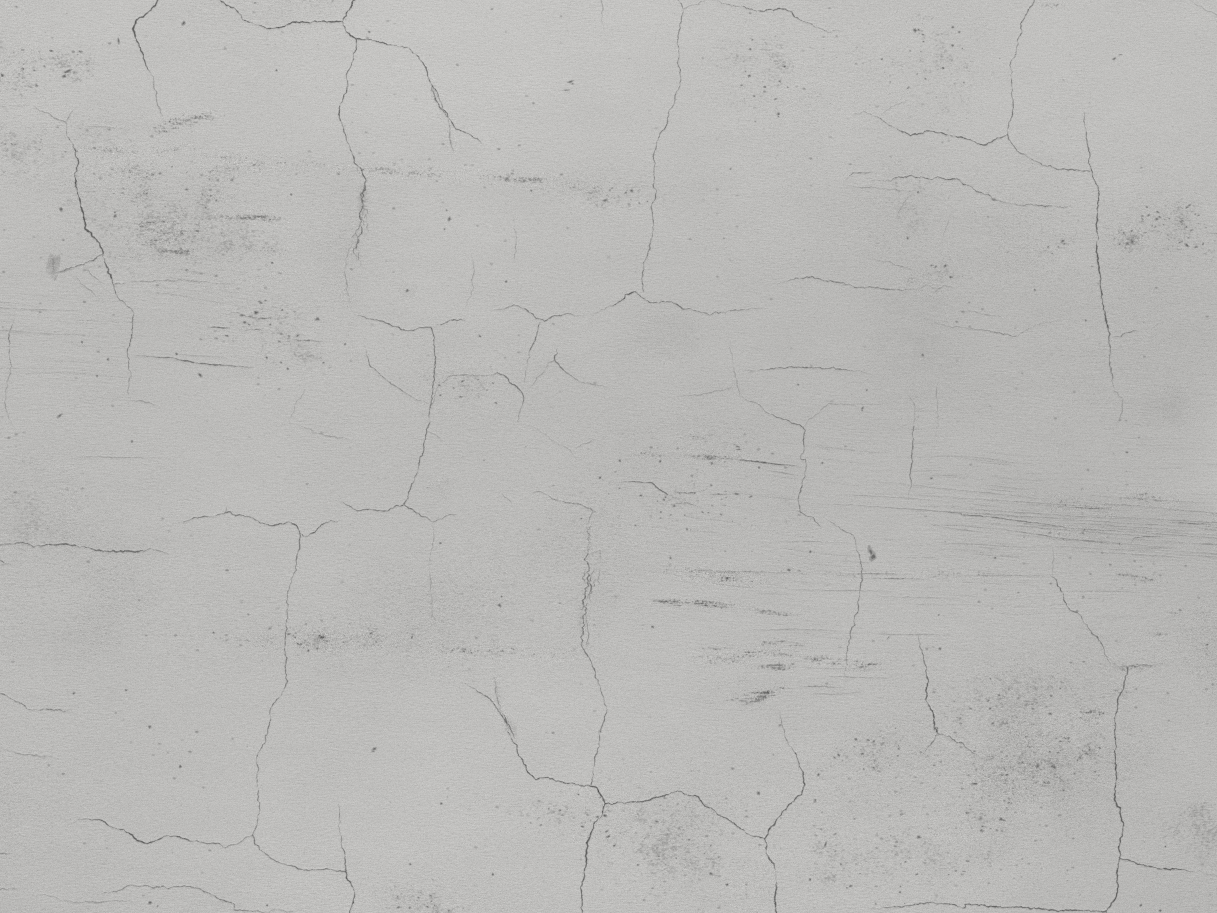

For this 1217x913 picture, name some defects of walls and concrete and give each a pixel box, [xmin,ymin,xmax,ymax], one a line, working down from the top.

crack [0,0,870,913]
crack [907,393,917,500]
crack [776,257,1059,338]
crack [843,0,1163,430]
crack [869,546,1217,913]